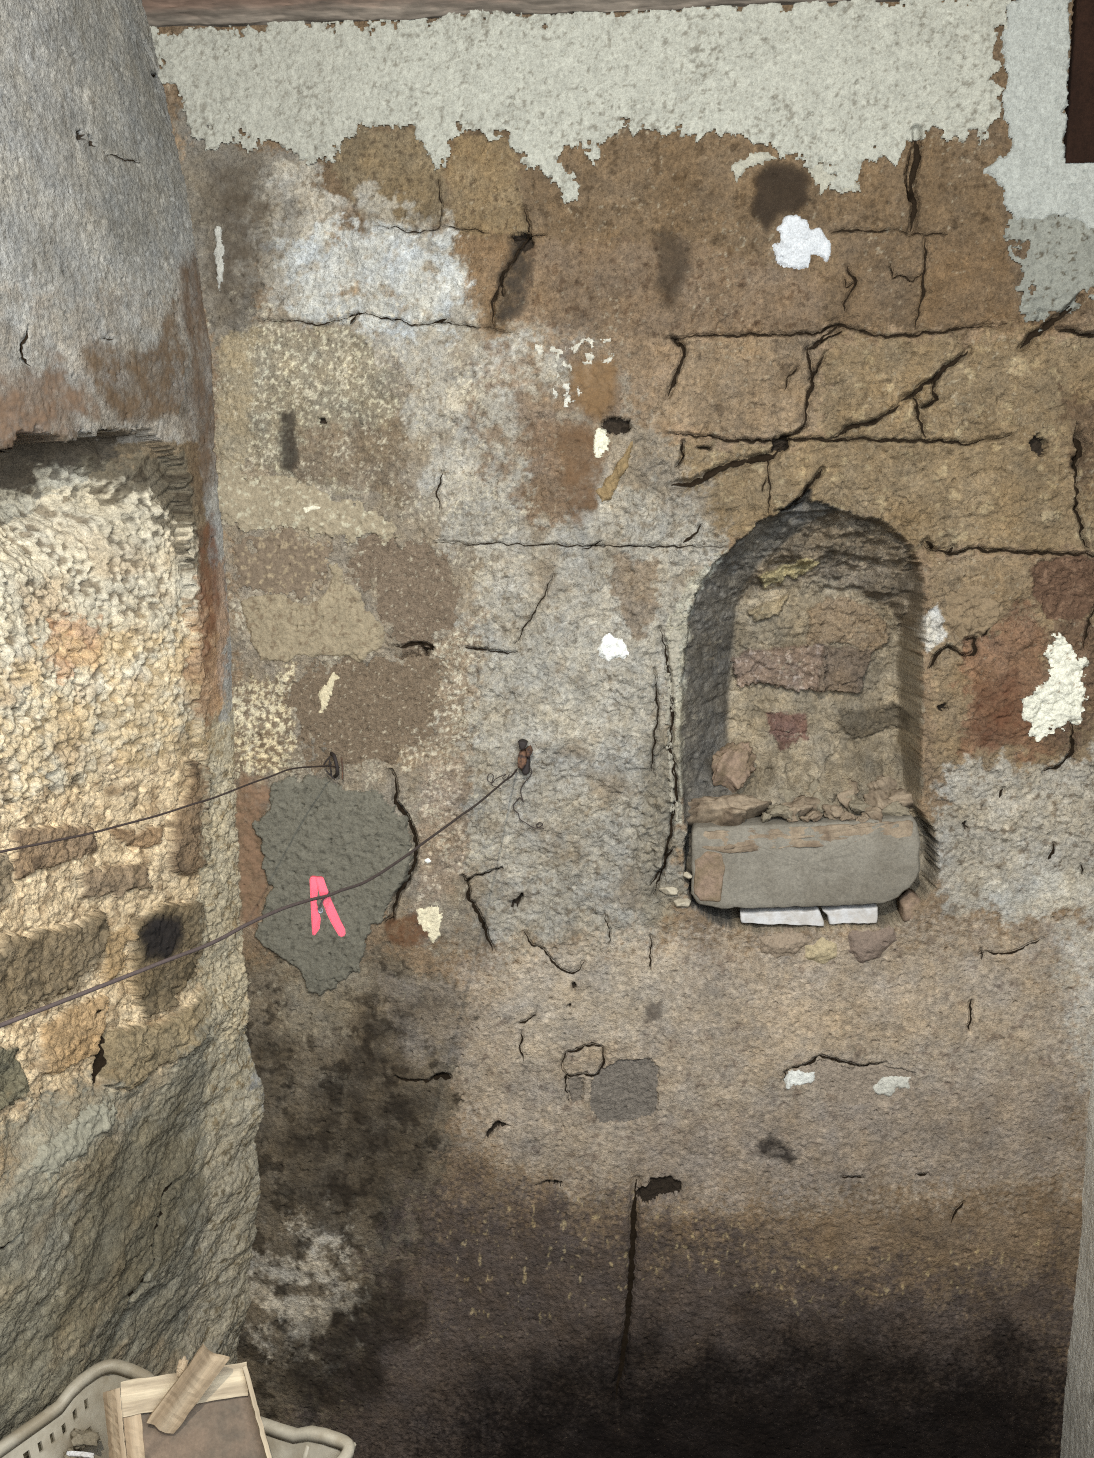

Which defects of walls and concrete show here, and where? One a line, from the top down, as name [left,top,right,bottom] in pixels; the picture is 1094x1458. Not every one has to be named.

damp [753,165,807,228]
flaking render [213,226,225,291]
flaking render [534,337,614,407]
crack [668,140,1094,513]
flaking render [593,428,610,458]
crack [923,434,1094,557]
spalling [0,424,207,808]
crack [395,473,725,654]
flaking render [663,577,699,822]
spalling [590,1058,659,1123]
crack [783,1055,884,1081]
crack [615,1179,637,1399]